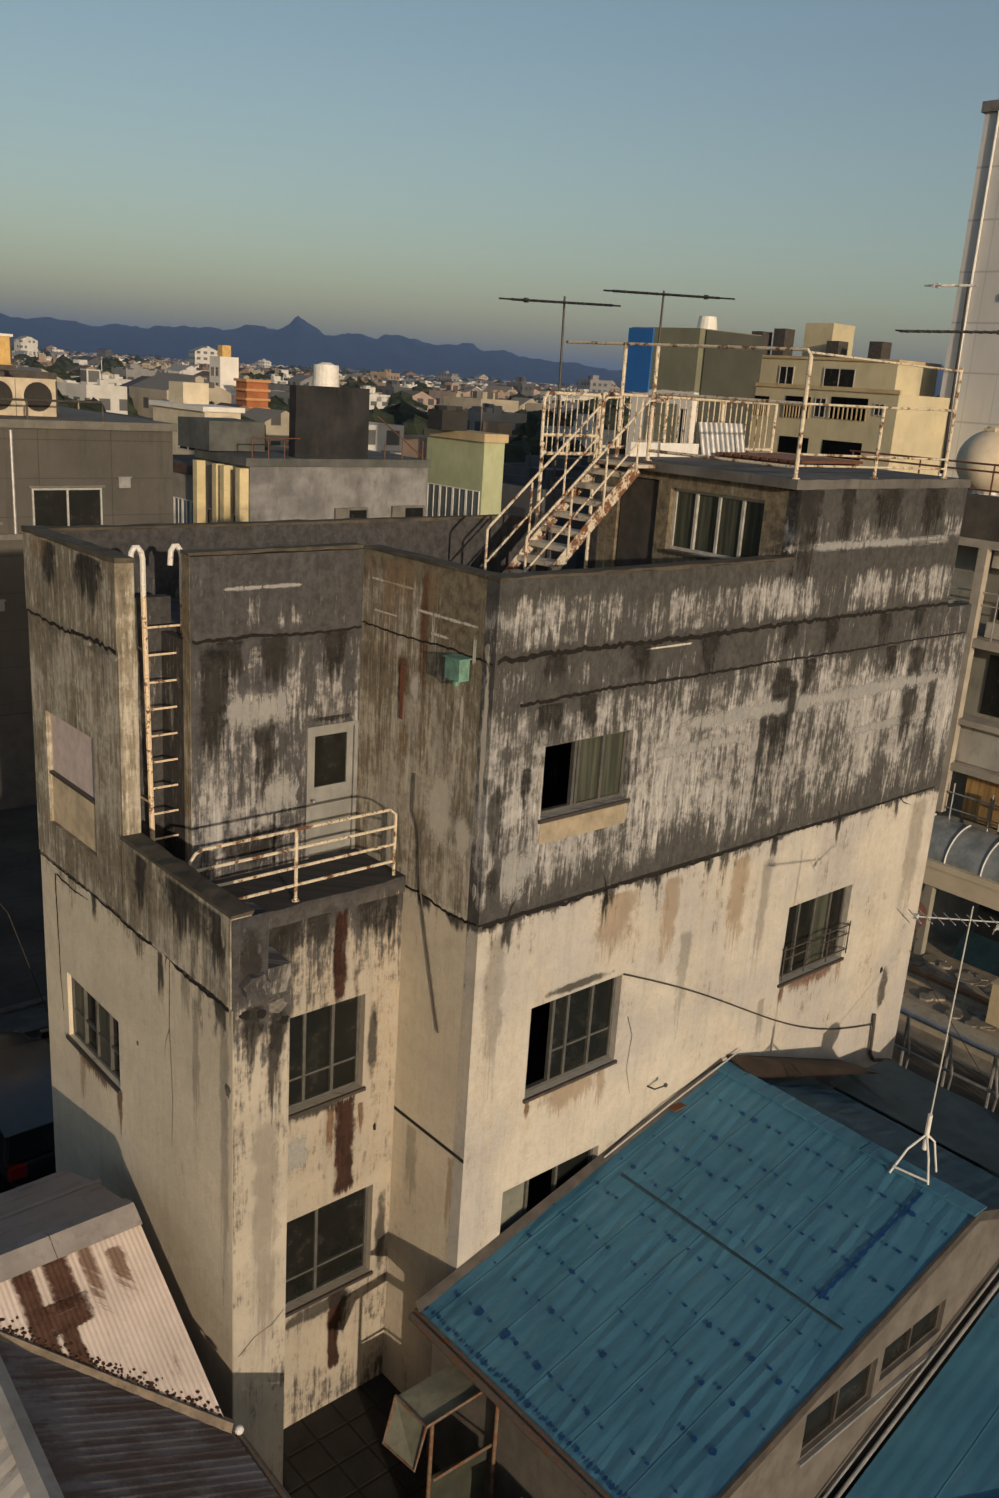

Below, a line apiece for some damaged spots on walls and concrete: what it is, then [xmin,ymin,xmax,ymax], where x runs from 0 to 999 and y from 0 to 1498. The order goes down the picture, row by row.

damp [74,554,102,619]
damp [225,583,302,591]
damp [788,488,947,589]
damp [200,651,299,862]
damp [521,769,531,808]
crack [192,602,965,730]
damp [656,647,938,796]
damp [487,789,535,901]
corrosion [333,908,348,999]
damp [243,1007,339,1170]
corrosion [327,1095,363,1195]
corrosion [12,1244,132,1366]